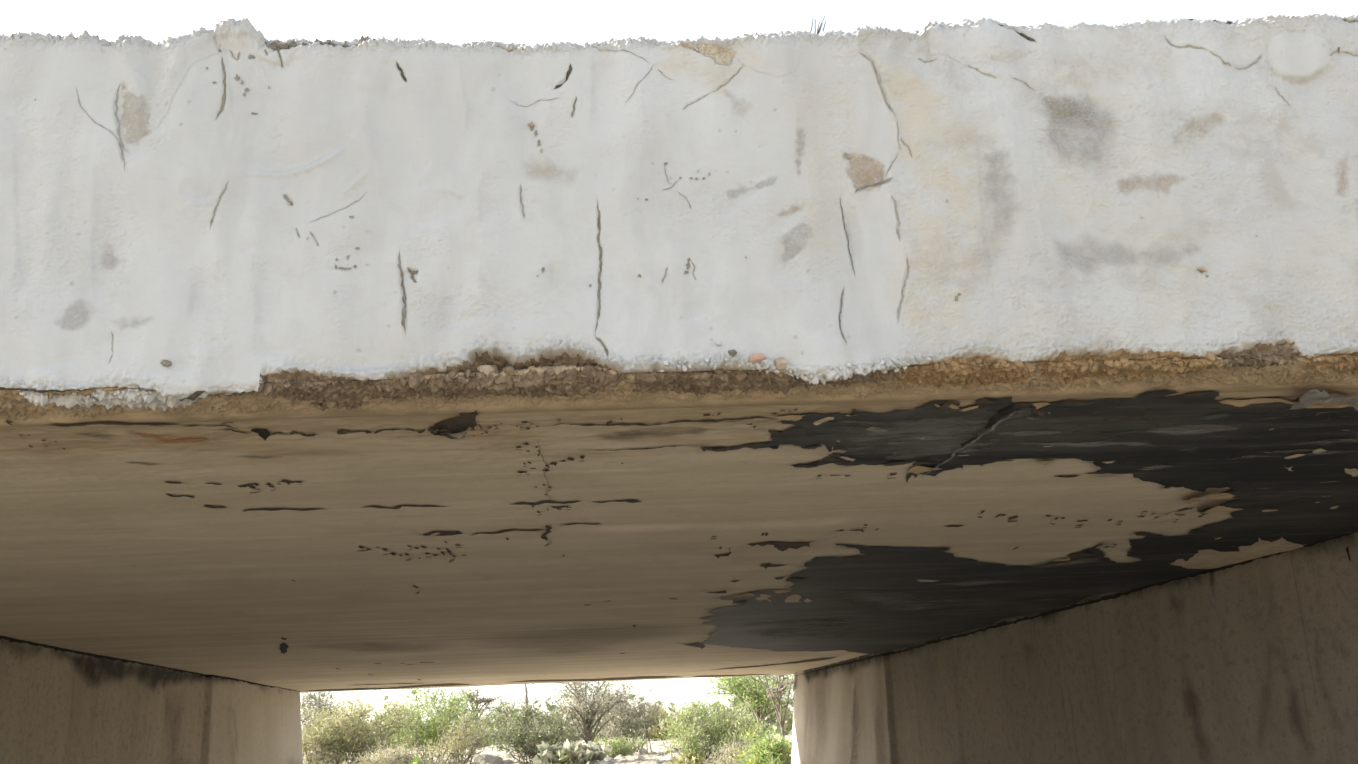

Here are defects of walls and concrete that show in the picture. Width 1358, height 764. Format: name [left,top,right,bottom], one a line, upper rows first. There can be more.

crack [398,250,419,335]
crack [595,201,609,357]
crack [165,481,322,512]
crack [362,416,775,539]
peeling [200,341,1358,654]
crack [923,405,1016,476]